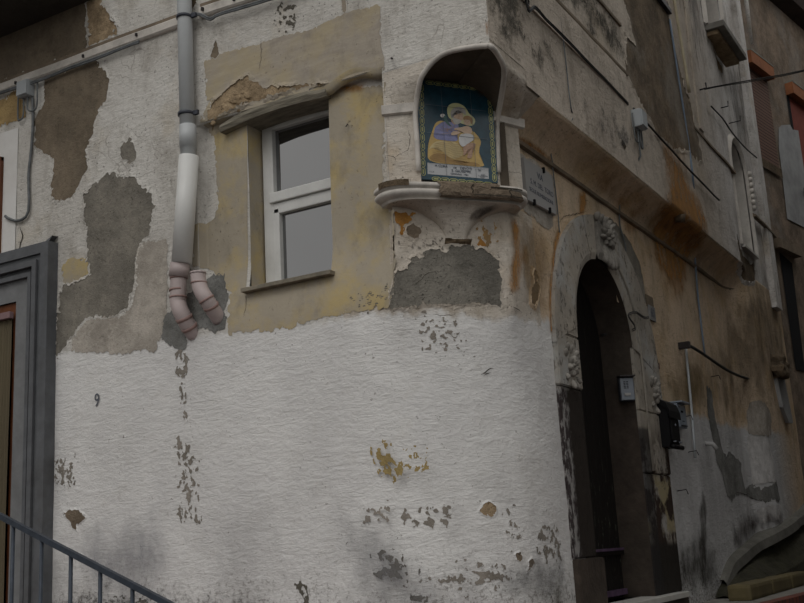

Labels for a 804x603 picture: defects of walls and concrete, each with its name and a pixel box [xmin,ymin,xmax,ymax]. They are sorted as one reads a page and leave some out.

flaking render [0,0,122,81]
peeling [200,0,385,136]
leakage [494,0,522,39]
leakage [573,0,623,53]
flaking render [622,0,704,168]
flaking render [30,59,169,368]
spalling [350,220,505,353]
peeling [174,436,202,525]
peeling [370,439,429,484]
peeling [397,504,457,539]
flaking render [477,499,562,574]
peeling [418,559,512,598]